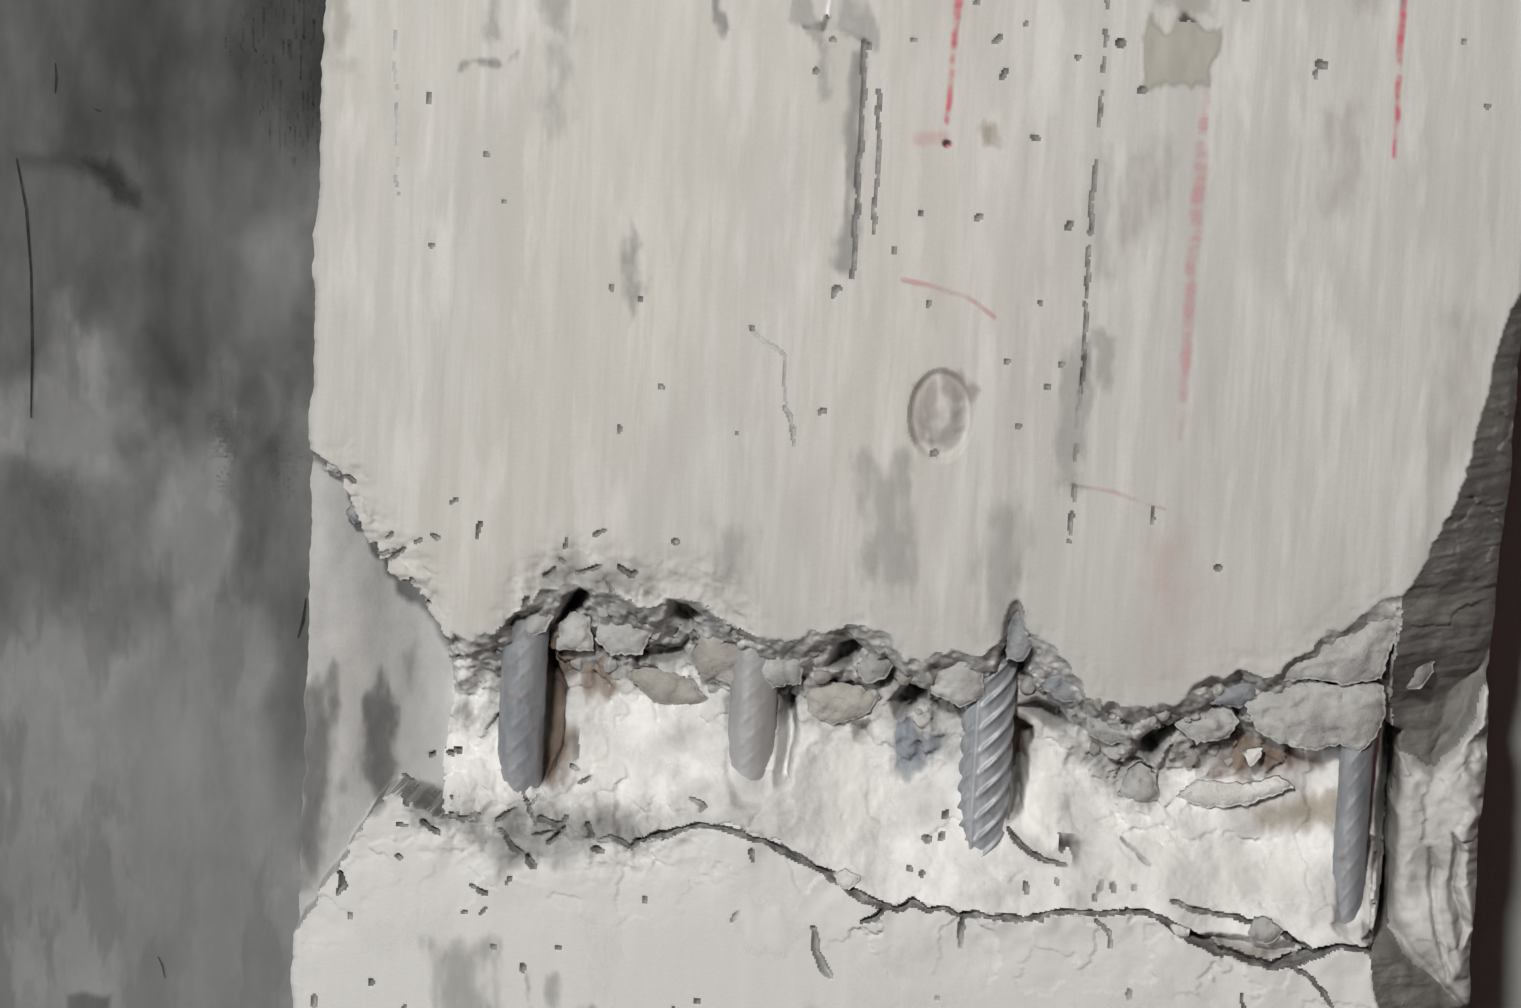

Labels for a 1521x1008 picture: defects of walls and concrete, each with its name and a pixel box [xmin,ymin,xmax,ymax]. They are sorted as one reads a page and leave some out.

spalling [831,284,843,299]
spalling [293,296,1521,1008]
crack [633,821,1374,1008]